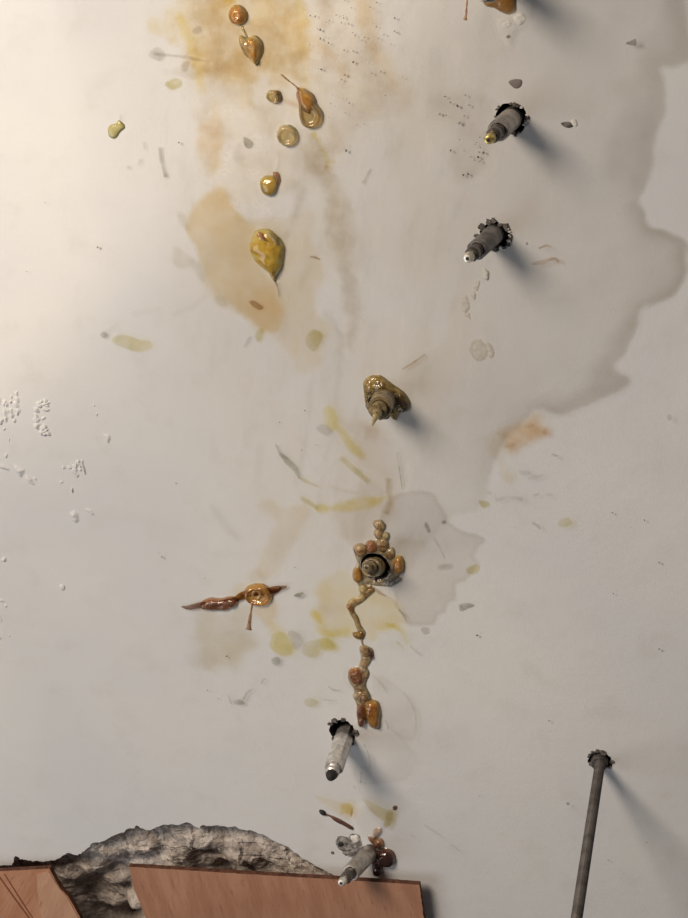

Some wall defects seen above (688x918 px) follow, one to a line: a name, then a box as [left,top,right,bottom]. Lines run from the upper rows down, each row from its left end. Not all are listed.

spalling [0,822,335,918]